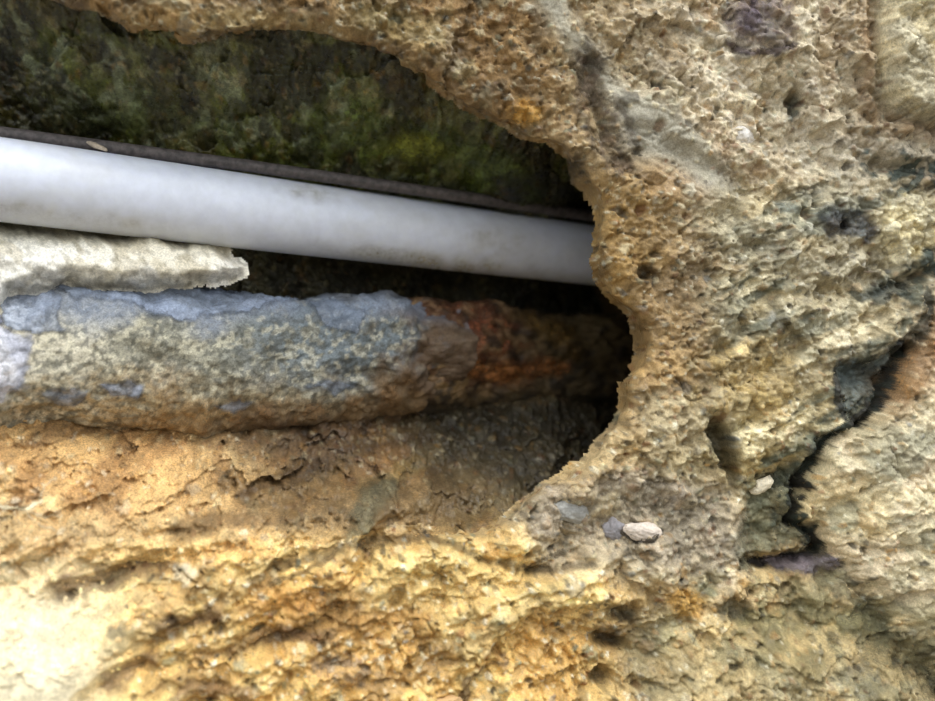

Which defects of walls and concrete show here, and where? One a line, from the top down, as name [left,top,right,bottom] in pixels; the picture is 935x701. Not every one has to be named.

spalling [0,0,595,225]
crack [858,149,935,196]
peeling [42,388,87,406]
spalling [0,248,604,402]
spalling [0,394,750,678]
crack [740,248,935,609]